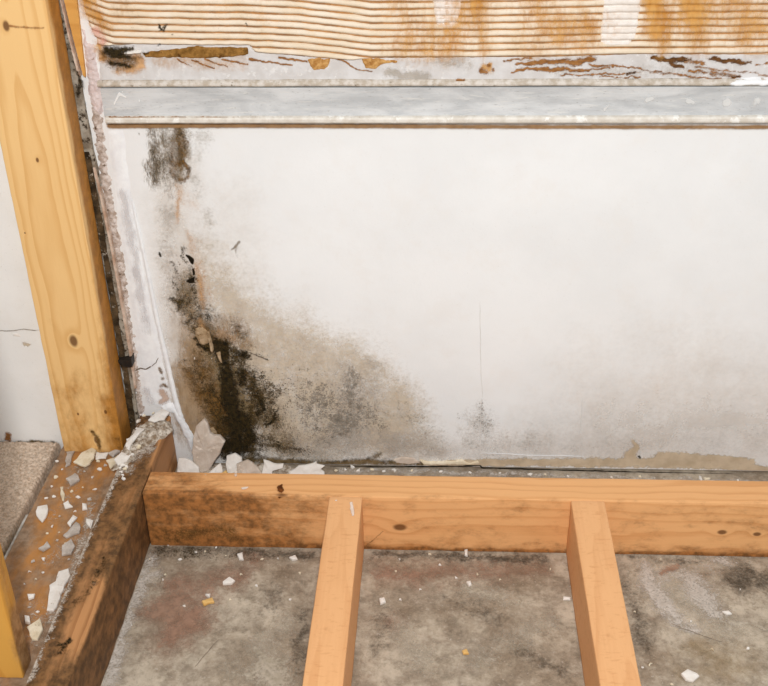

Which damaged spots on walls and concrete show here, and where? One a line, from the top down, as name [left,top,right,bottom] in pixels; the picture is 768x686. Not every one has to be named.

leakage [144,123,191,184]
leakage [169,243,423,466]
peeling [393,440,768,471]